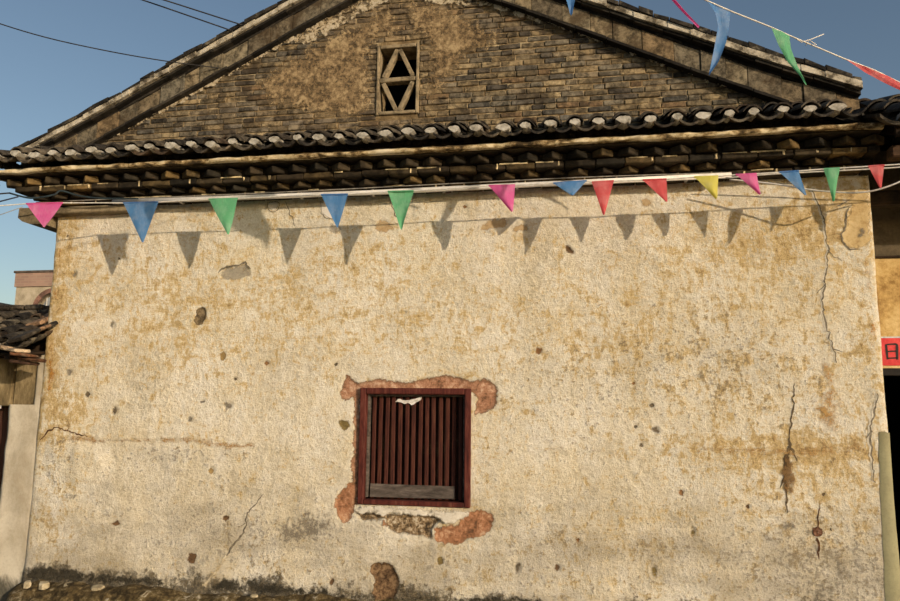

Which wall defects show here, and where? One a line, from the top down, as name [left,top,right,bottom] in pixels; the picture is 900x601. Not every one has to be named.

spalling [386,60,416,111]
spalling [218,261,251,280]
crack [810,191,842,363]
spalling [194,307,206,325]
crack [40,420,88,440]
spalling [334,374,498,545]
crack [780,383,797,513]
crack [866,393,879,483]
crack [203,494,264,587]
damp [26,566,163,586]
damp [209,578,374,598]
spalling [370,562,400,601]